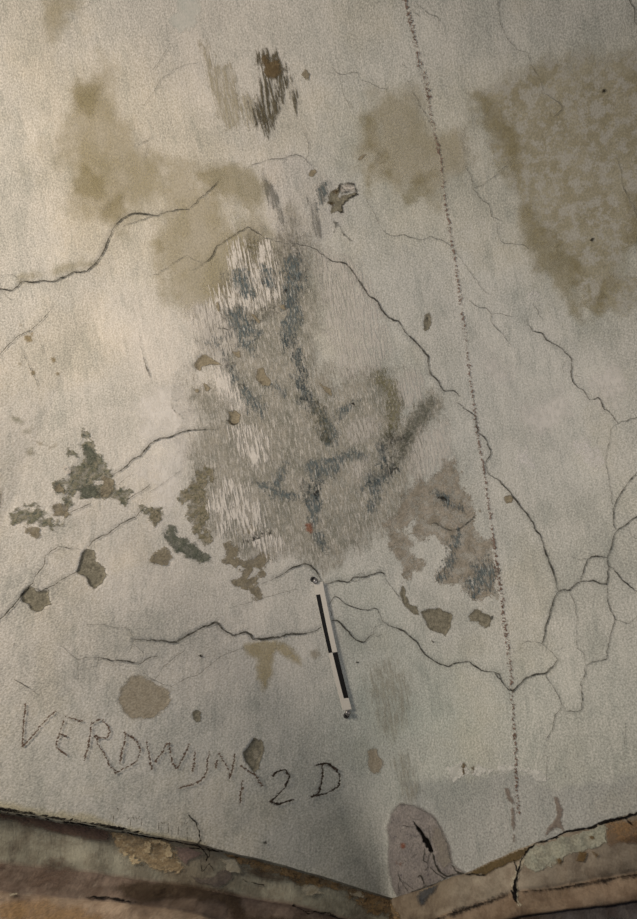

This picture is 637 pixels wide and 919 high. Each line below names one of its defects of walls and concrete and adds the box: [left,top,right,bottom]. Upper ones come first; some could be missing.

water stain [199,39,298,138]
crack [0,184,216,291]
water stain [77,91,156,206]
water stain [483,56,637,313]
water stain [164,176,456,571]
spalling [22,586,51,611]
peeling [9,428,133,538]
spalling [77,549,106,589]
peeling [139,466,271,601]
crack [61,227,637,738]
peeling [382,458,501,636]
crack [511,812,637,902]